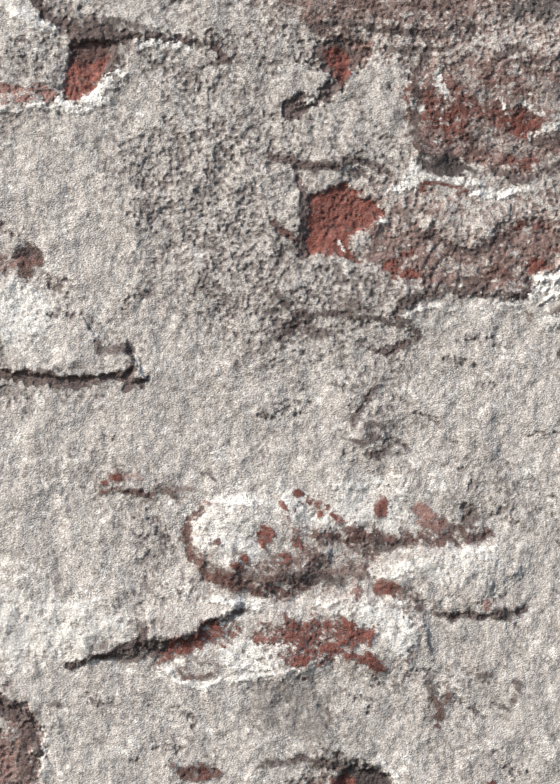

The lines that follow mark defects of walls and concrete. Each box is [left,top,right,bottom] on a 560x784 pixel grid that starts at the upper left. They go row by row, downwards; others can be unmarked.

spalling [0,38,110,105]
spalling [282,36,375,121]
spalling [401,50,560,179]
spalling [304,181,560,329]
crack [0,339,150,393]
crack [64,594,274,671]
crack [178,660,218,681]
spalling [145,500,387,681]
spalling [373,578,424,611]
spalling [0,701,49,784]
spalling [303,762,392,784]